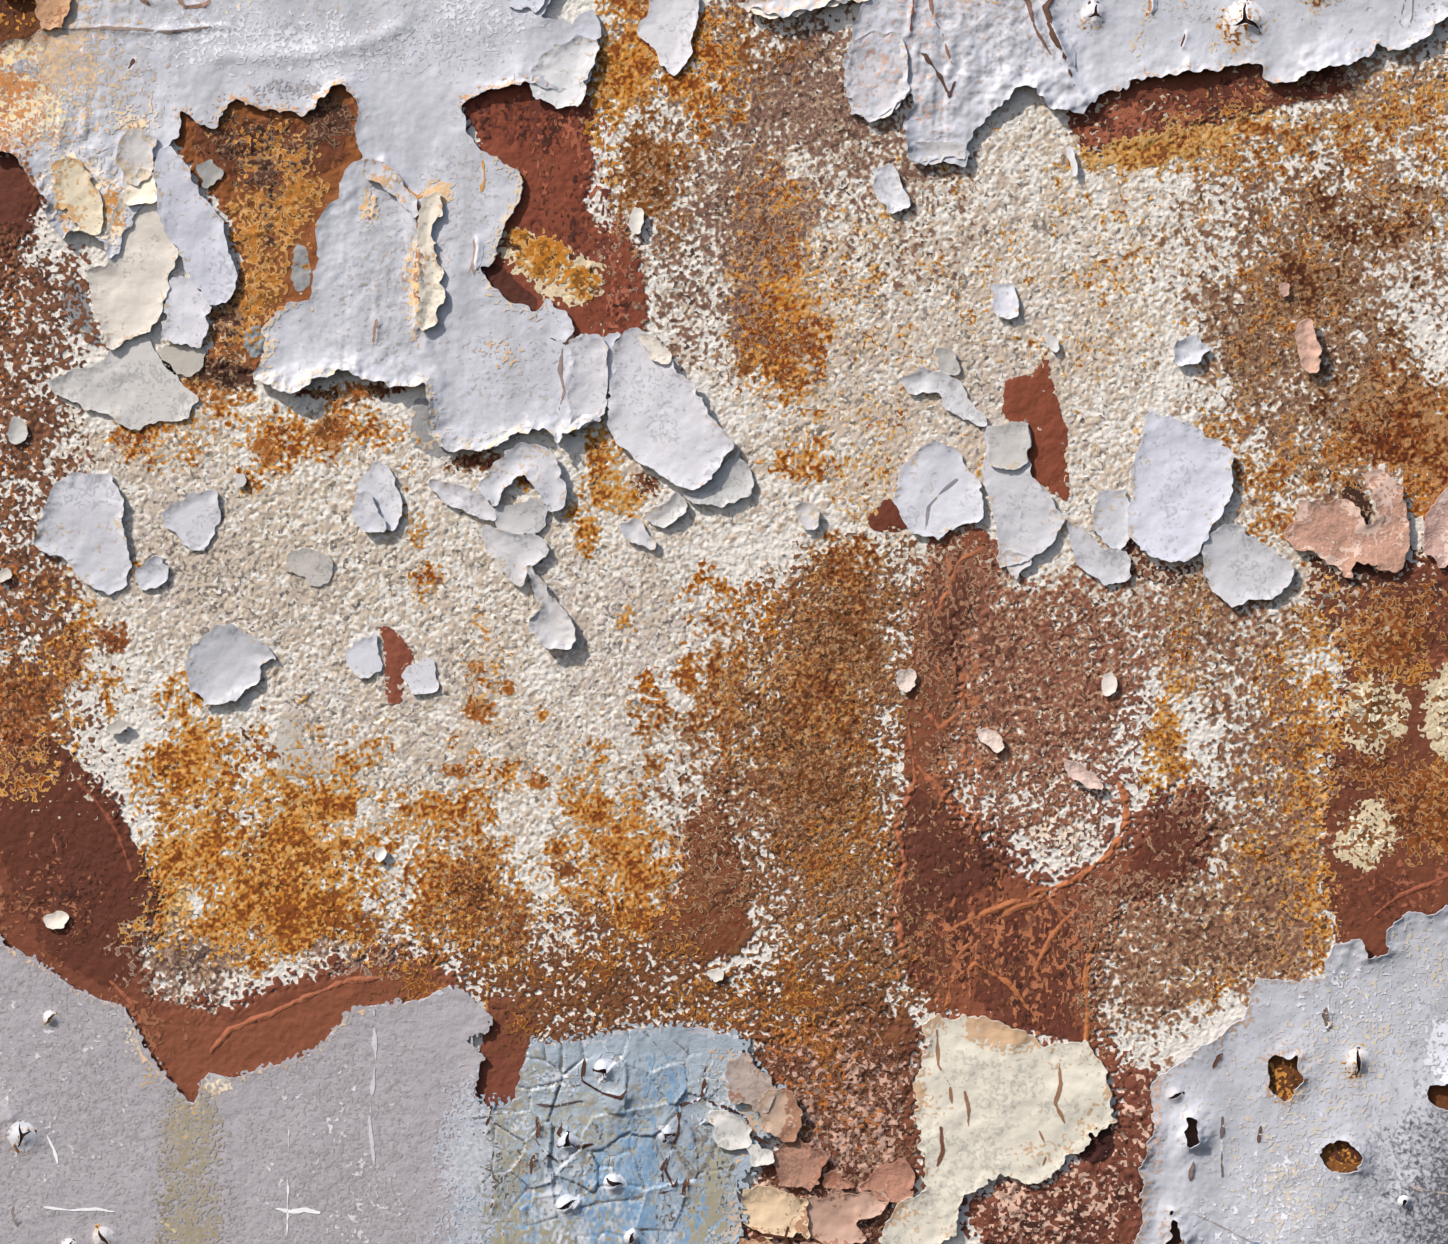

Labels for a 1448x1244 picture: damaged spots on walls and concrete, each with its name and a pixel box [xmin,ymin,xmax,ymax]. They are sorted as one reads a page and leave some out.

peeling [35,0,71,30]
crack [910,0,960,98]
peeling [362,158,446,330]
rust [400,234,442,354]
rust [494,475,539,508]
peeling [43,911,69,929]
peeling [157,860,234,942]
peeling [1268,909,1411,1059]
rust [1252,1029,1320,1110]
crack [473,1033,783,1244]
rust [722,1188,808,1244]
rust [853,1184,897,1244]